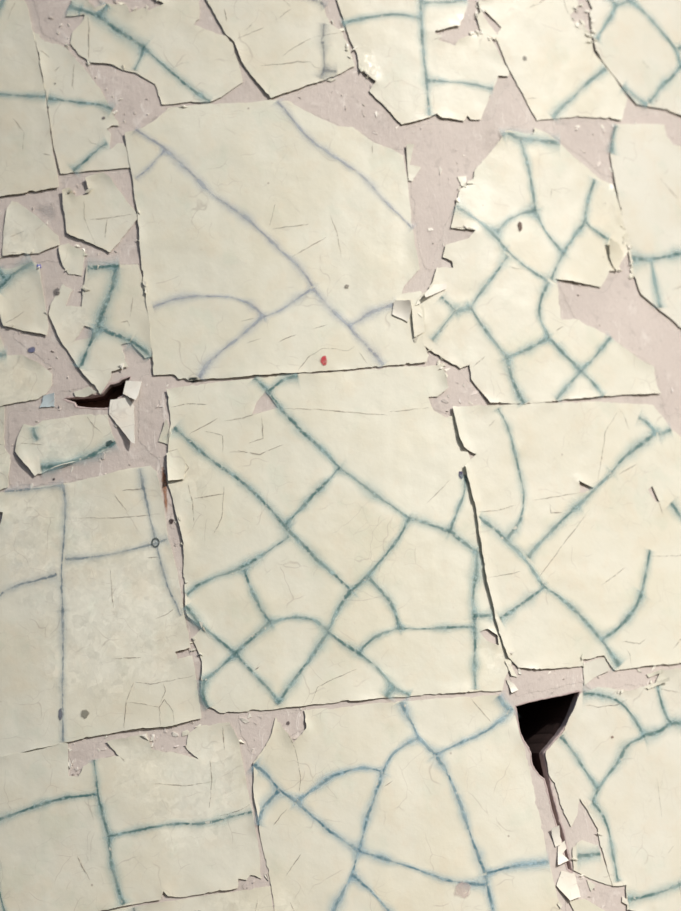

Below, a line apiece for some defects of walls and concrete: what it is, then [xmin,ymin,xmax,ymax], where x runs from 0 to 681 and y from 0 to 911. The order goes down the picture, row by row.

crack [69,4,210,101]
crack [261,0,493,115]
peeling [439,0,501,44]
crack [596,0,681,106]
peeling [0,173,141,271]
crack [79,263,151,368]
peeling [392,284,447,342]
crack [432,132,611,404]
peeling [8,324,198,553]
crack [0,363,681,911]
peeling [506,654,671,697]
peeling [551,826,632,911]